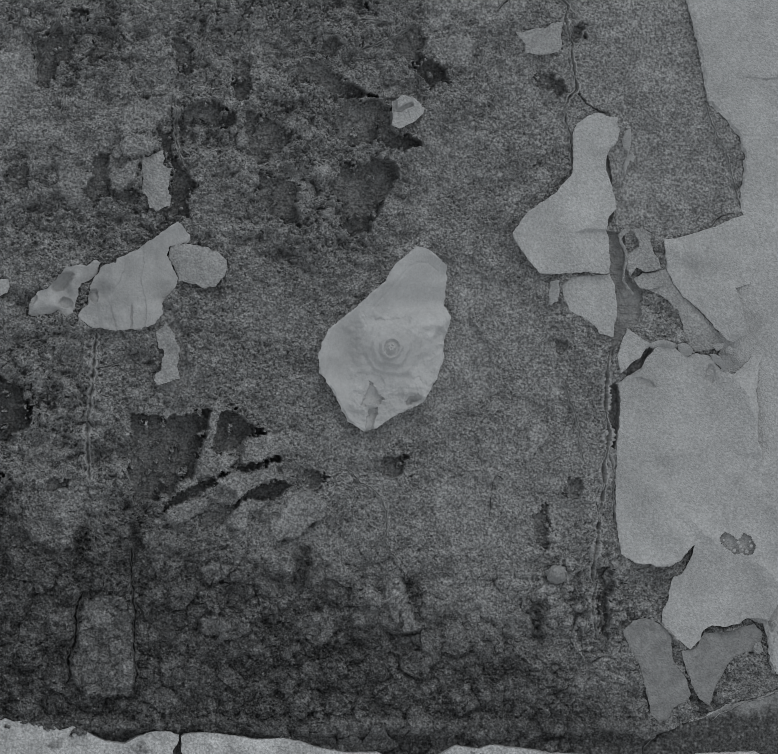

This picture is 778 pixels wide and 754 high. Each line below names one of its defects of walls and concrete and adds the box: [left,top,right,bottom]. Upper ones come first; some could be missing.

flaking render [516,22,586,55]
spalling [533,73,564,96]
flaking render [28,128,227,385]
flaking render [512,113,762,373]
spalling [532,504,549,549]
spalling [561,477,582,500]
crack [562,352,616,639]
spalling [596,567,612,633]
flaking render [623,618,778,724]